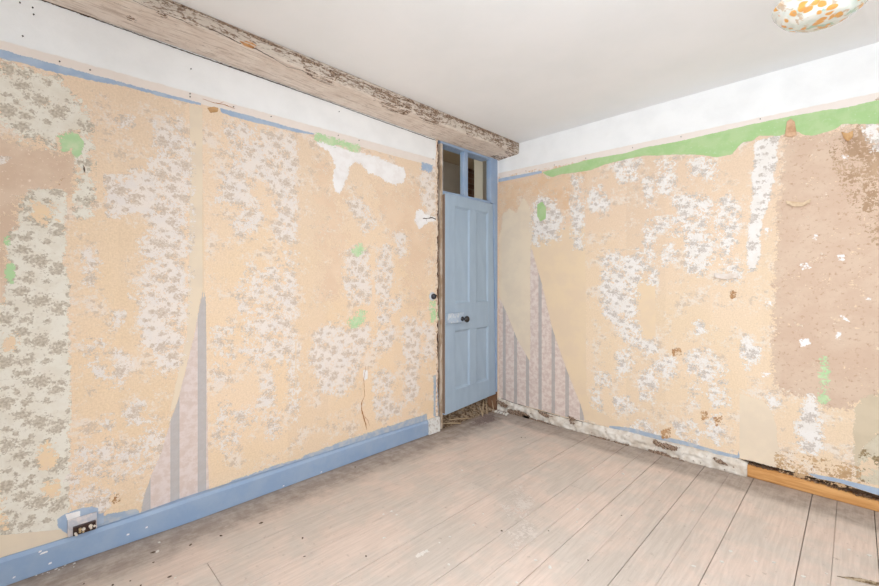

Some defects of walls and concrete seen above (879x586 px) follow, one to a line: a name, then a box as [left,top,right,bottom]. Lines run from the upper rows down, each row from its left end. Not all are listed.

peeling [72,135,97,220]
peeling [156,0,519,161]
peeling [316,139,439,421]
peeling [569,172,586,252]
peeling [610,156,747,287]
peeling [785,119,797,137]
peeling [35,398,167,527]
peeling [212,339,303,457]
flaking render [496,319,749,477]
peeling [858,456,879,477]